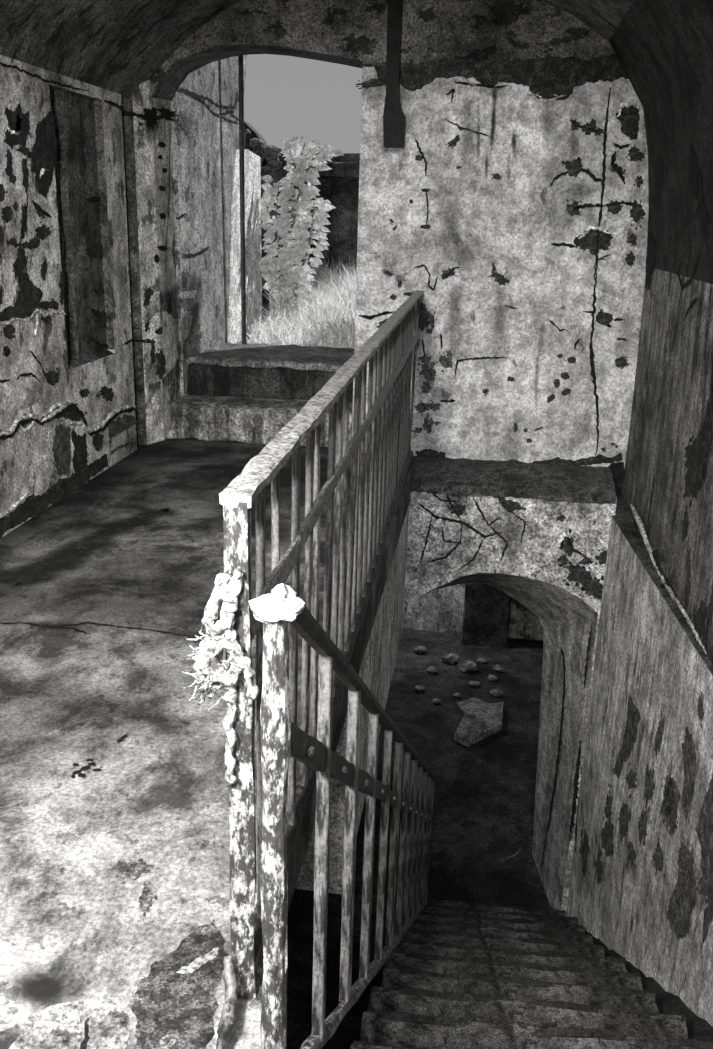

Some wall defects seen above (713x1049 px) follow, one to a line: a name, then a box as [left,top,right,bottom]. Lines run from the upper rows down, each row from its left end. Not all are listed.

spalling [355,62,386,89]
spalling [400,53,629,101]
peeling [0,104,66,342]
crack [589,87,611,456]
peeling [550,100,656,291]
flaking render [0,413,137,539]
crack [417,493,526,570]
flaking render [447,480,526,516]
flaking render [556,514,607,600]
flaking render [630,504,709,654]
peeling [575,691,713,949]
crack [80,1018,89,1049]